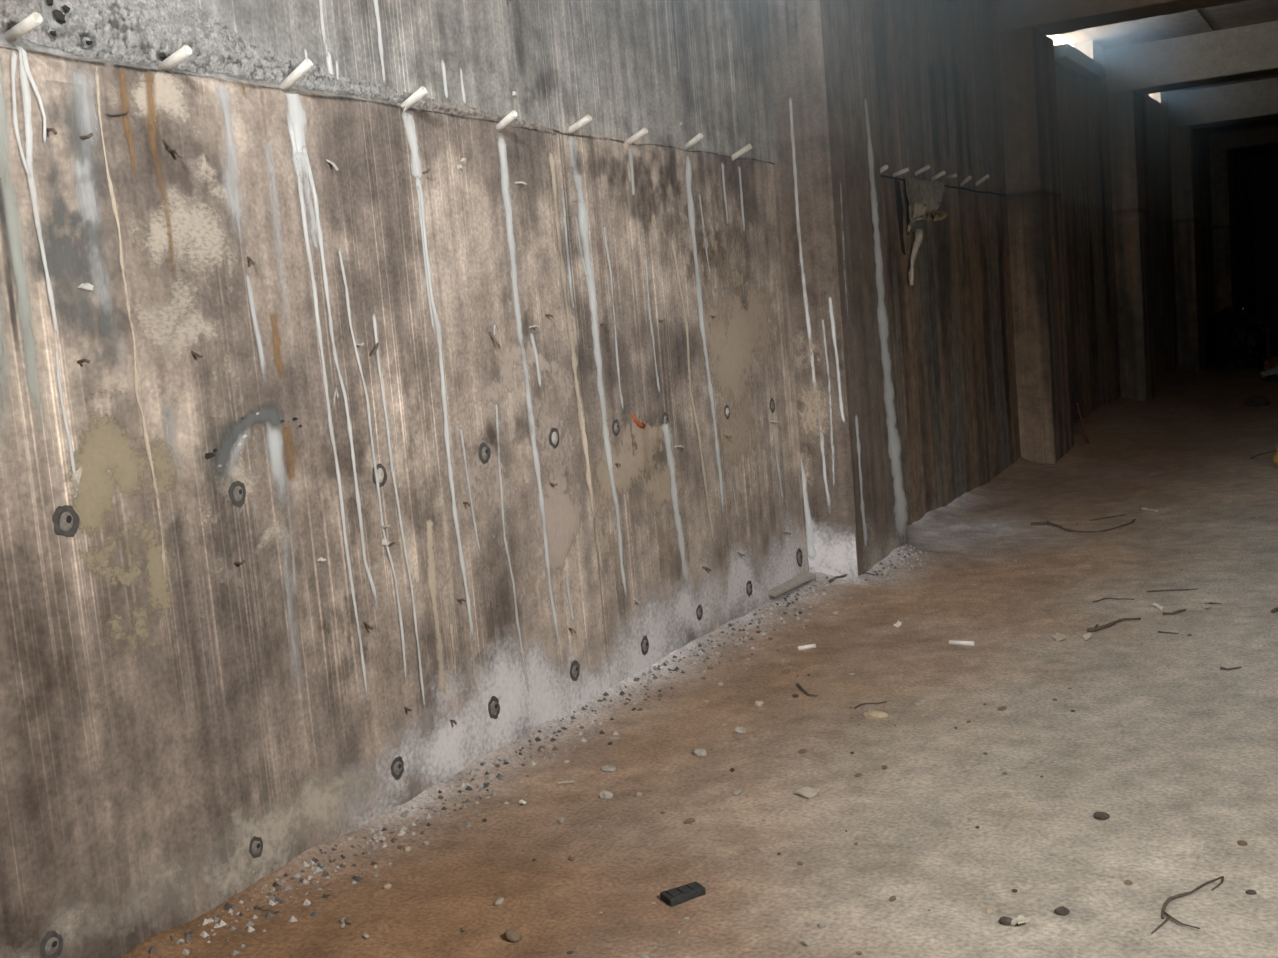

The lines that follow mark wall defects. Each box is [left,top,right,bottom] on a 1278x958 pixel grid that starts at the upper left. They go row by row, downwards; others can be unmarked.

rust [147,74,161,180]
damp [0,47,110,404]
damp [55,350,76,473]
damp [203,87,907,895]
damp [56,910,99,940]